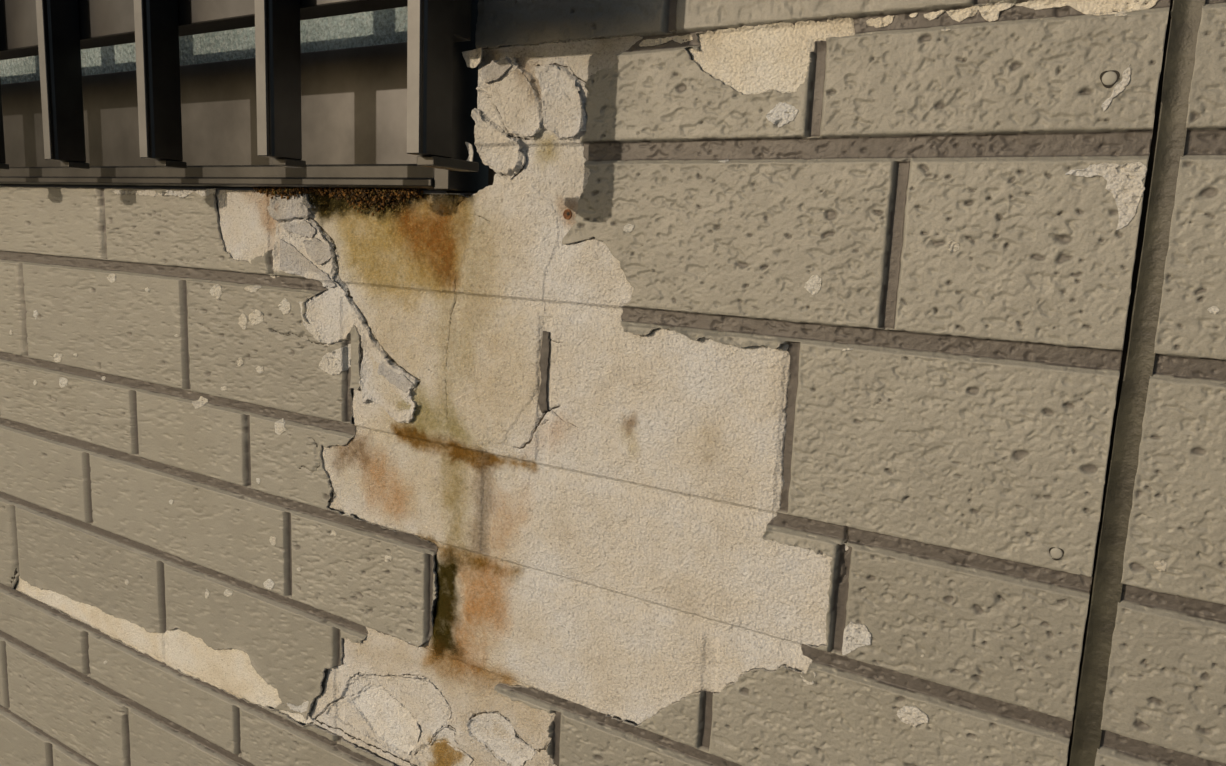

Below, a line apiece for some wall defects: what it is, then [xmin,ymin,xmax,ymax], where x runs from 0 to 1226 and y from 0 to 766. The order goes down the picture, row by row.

peeling [909,0,1158,32]
peeling [1101,64,1131,111]
water stain [308,192,427,218]
peeling [1065,162,1147,231]
peeling [14,15,894,766]
corrosion [395,429,427,446]
crack [515,406,578,449]
corrosion [448,443,496,465]
peeling [897,706,929,728]